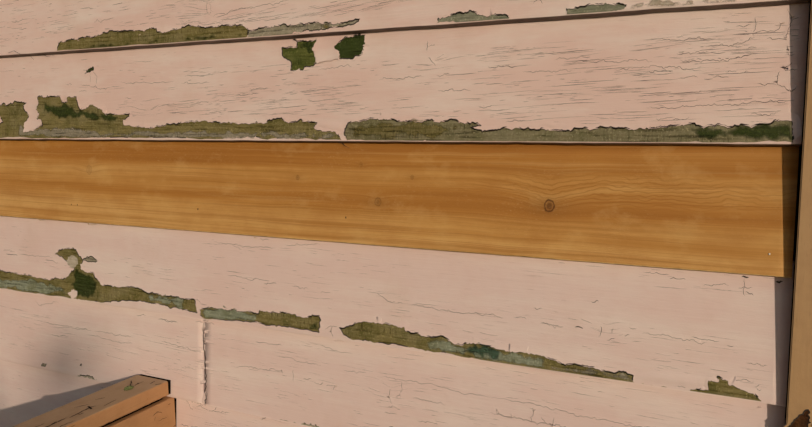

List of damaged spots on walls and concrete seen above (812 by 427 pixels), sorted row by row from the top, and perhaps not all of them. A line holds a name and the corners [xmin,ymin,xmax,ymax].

peeling [436,6,509,23]
peeling [56,15,371,76]
crack [0,0,800,124]
peeling [0,91,802,143]
peeling [0,244,324,335]
crack [37,296,215,351]
peeling [337,314,643,384]
crack [378,293,766,391]
crack [3,371,115,427]
crack [385,377,669,427]
peeling [690,371,761,401]